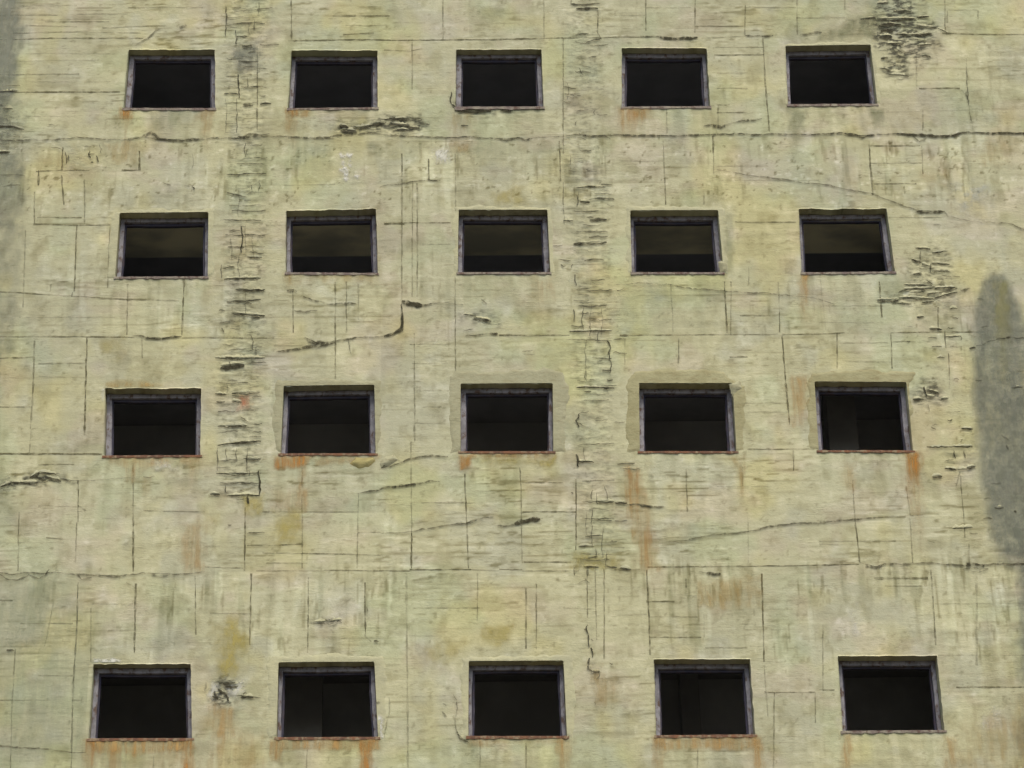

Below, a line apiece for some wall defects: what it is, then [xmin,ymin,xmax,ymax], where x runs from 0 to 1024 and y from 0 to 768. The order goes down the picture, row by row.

spalling [860,0,948,77]
crack [10,132,530,142]
spalling [339,116,430,134]
crack [556,119,1024,142]
crack [767,177,967,221]
spalling [210,1,279,504]
crack [294,296,356,313]
crack [278,300,435,352]
spalling [560,259,627,427]
spalling [877,246,1024,358]
water stain [976,276,1024,587]
spalling [212,677,260,705]